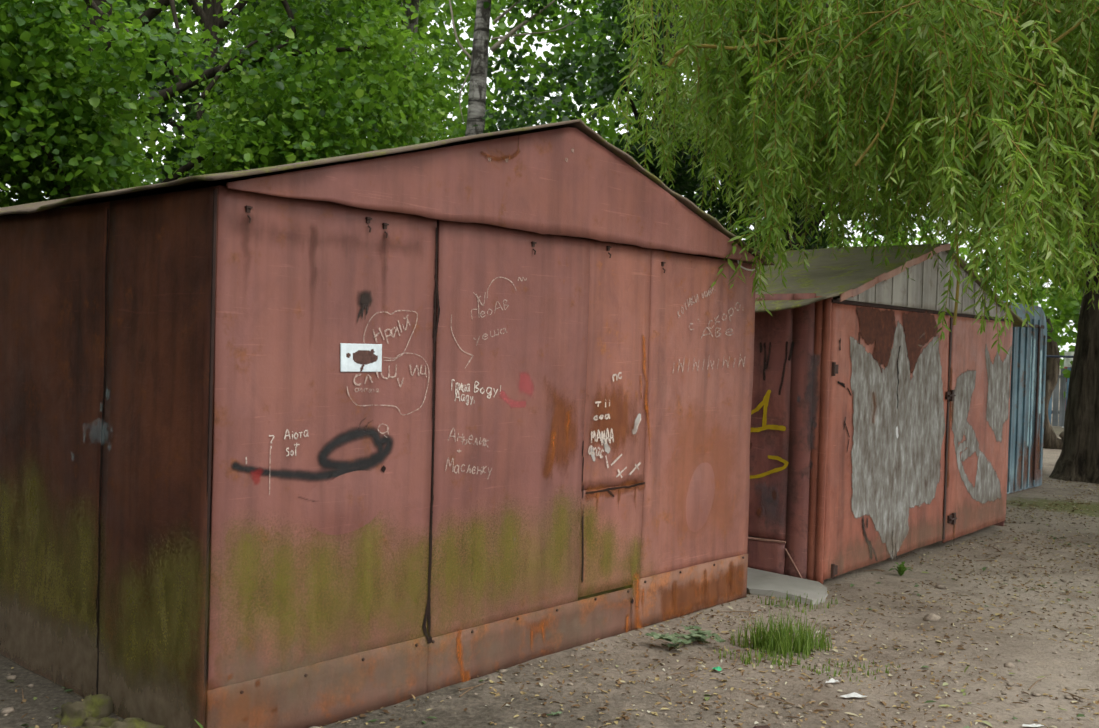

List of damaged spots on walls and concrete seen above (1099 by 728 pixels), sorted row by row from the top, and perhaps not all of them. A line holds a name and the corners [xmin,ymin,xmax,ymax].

peeling [856,305,938,409]
corrosion [663,563,744,618]